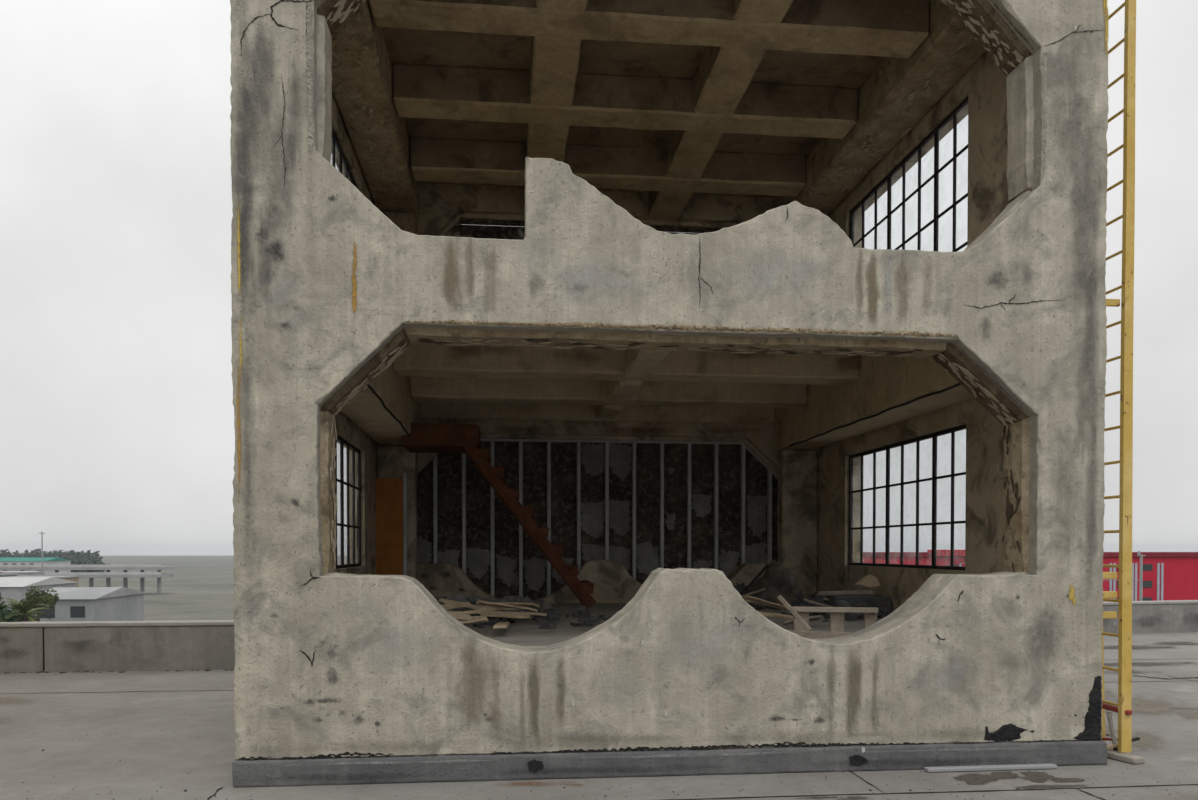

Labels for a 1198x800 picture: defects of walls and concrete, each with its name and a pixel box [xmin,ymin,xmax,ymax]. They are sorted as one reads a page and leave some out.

crack [240,0,315,53]
peeling [941,0,1023,75]
crack [991,0,1105,50]
crack [274,78,286,200]
damp [444,243,472,301]
crack [698,239,713,305]
damp [858,258,906,320]
crack [967,295,1063,311]
damp [529,668,539,734]
damp [848,660,876,728]
spalling [984,723,1034,742]
spalling [1074,675,1102,741]